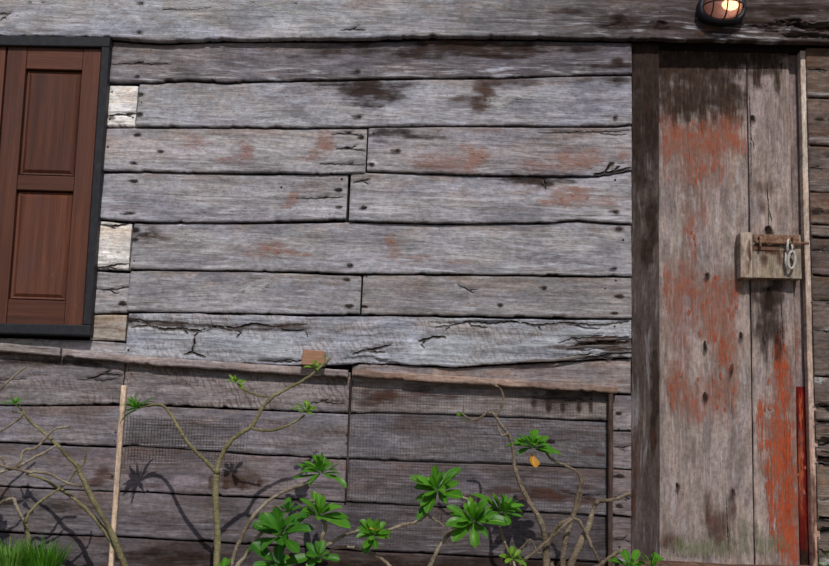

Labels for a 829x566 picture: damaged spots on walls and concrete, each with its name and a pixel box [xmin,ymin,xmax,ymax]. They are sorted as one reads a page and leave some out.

damp [318,81,409,107]
damp [453,79,526,110]
damp [612,43,787,187]
crack [131,318,308,358]
crack [257,357,302,365]
crack [353,344,391,355]
crack [418,320,631,360]
peeling [664,216,738,425]
peeling [756,331,829,566]